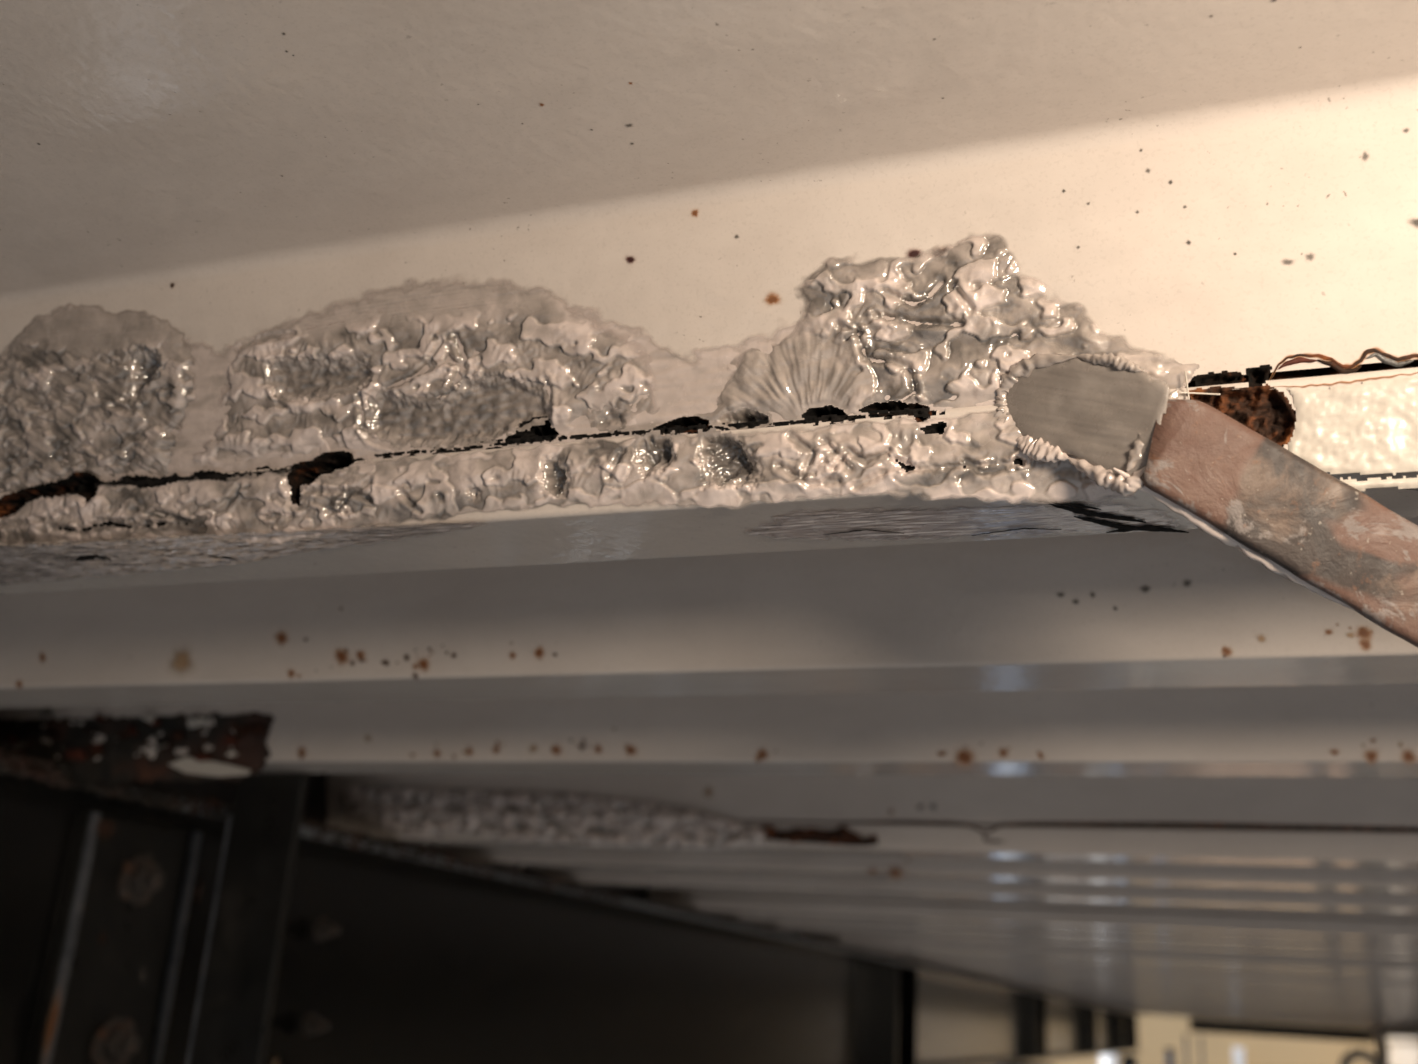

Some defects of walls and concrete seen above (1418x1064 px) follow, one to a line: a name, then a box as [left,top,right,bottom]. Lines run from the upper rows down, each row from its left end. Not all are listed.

rust [1276,372,1418,388]
crack [374,406,945,458]
crack [895,459,915,472]
crack [0,468,292,561]
rust [1326,624,1373,649]
rust [288,645,456,679]
rust [0,707,275,787]
rust [938,743,982,765]